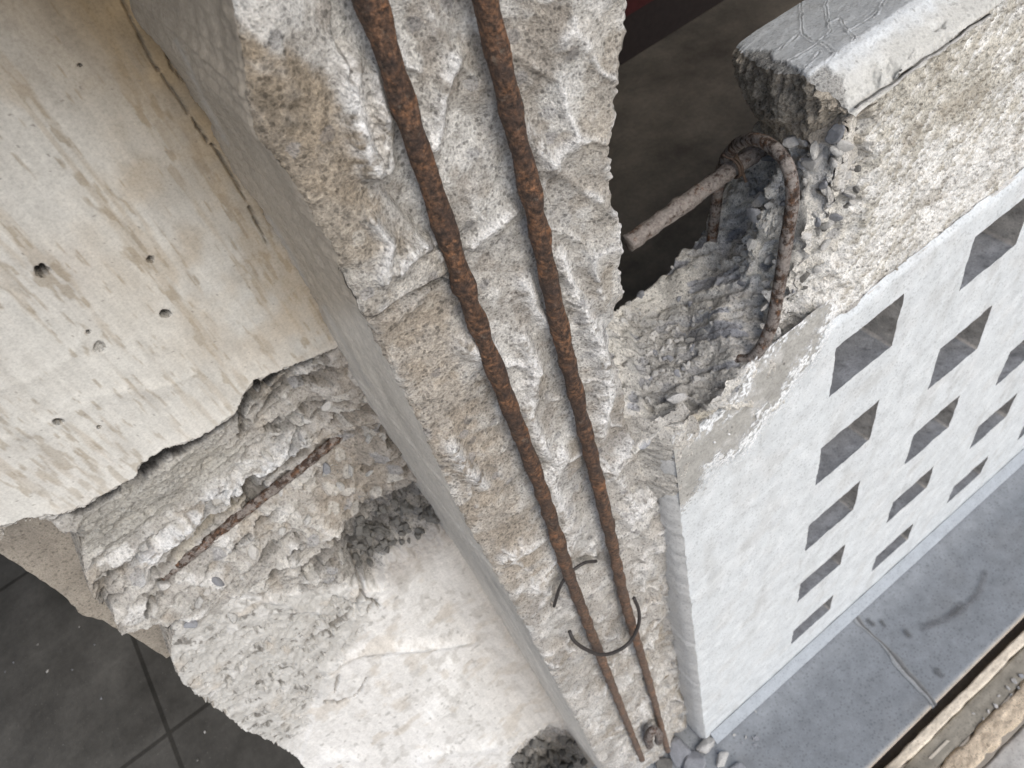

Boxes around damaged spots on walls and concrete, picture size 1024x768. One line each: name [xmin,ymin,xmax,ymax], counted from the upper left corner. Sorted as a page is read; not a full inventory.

crack [773,0,887,72]
crack [854,13,992,110]
spalling [0,348,417,728]
spalling [232,0,862,768]